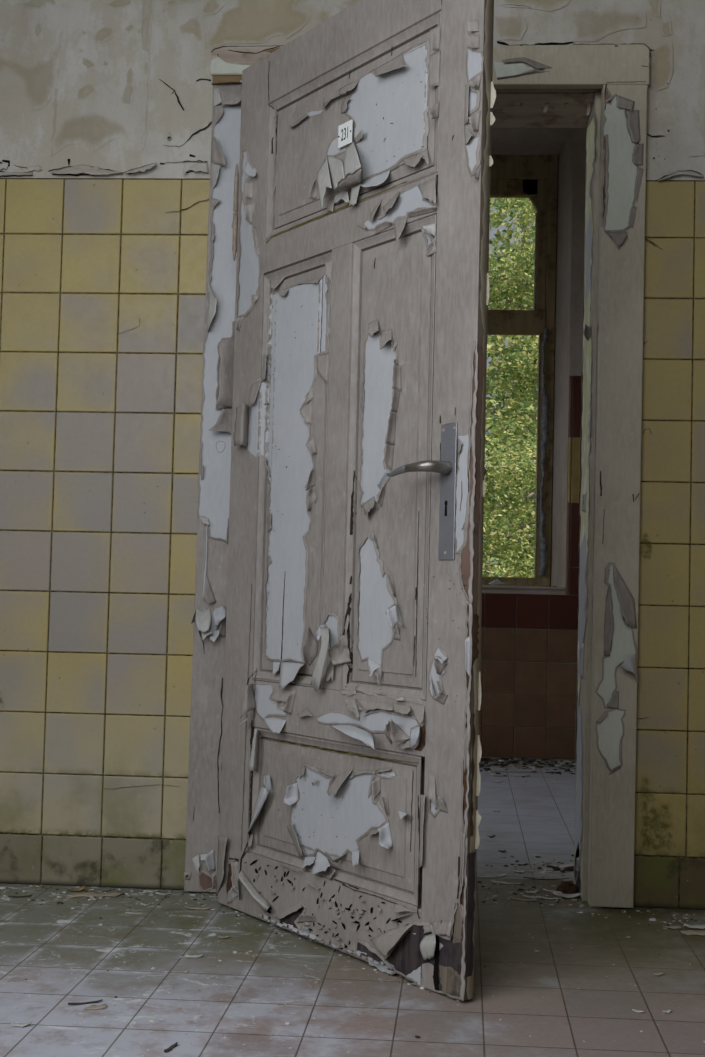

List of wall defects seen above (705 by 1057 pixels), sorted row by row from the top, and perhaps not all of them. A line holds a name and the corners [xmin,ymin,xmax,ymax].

flaking render [0,159,165,177]
crack [159,45,283,163]
peeling [290,25,441,212]
peeling [464,20,552,179]
peeling [183,57,486,971]
peeling [536,86,644,899]